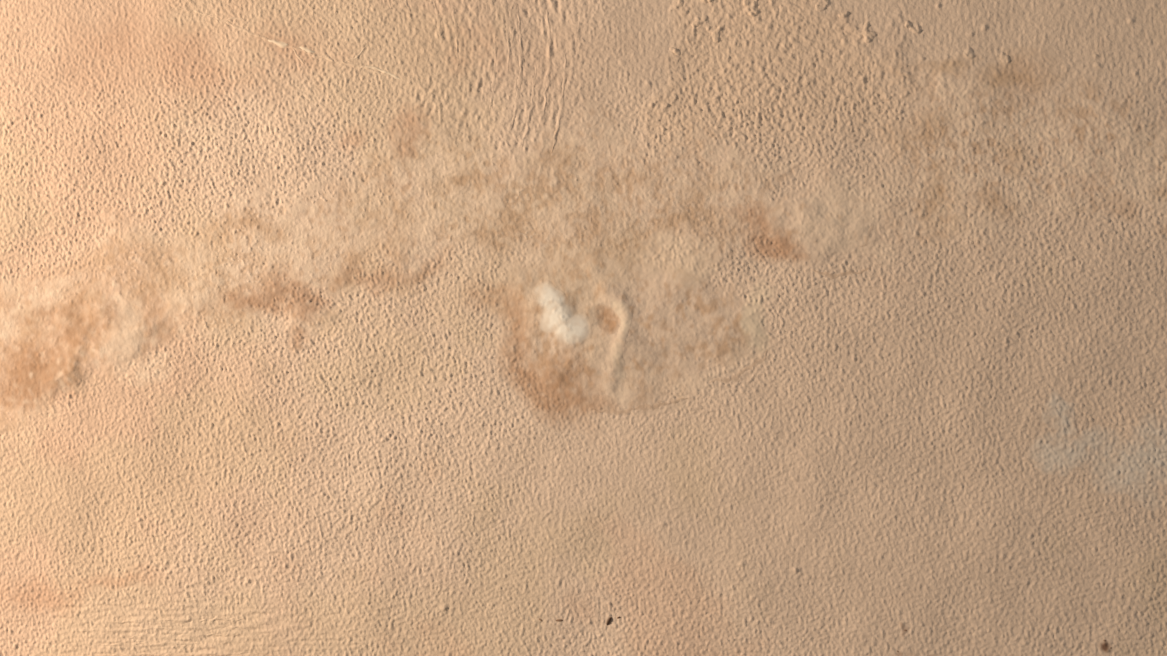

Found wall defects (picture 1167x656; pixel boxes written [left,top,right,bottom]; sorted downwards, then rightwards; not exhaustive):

damp [0,5,812,447]
damp [864,42,1167,259]